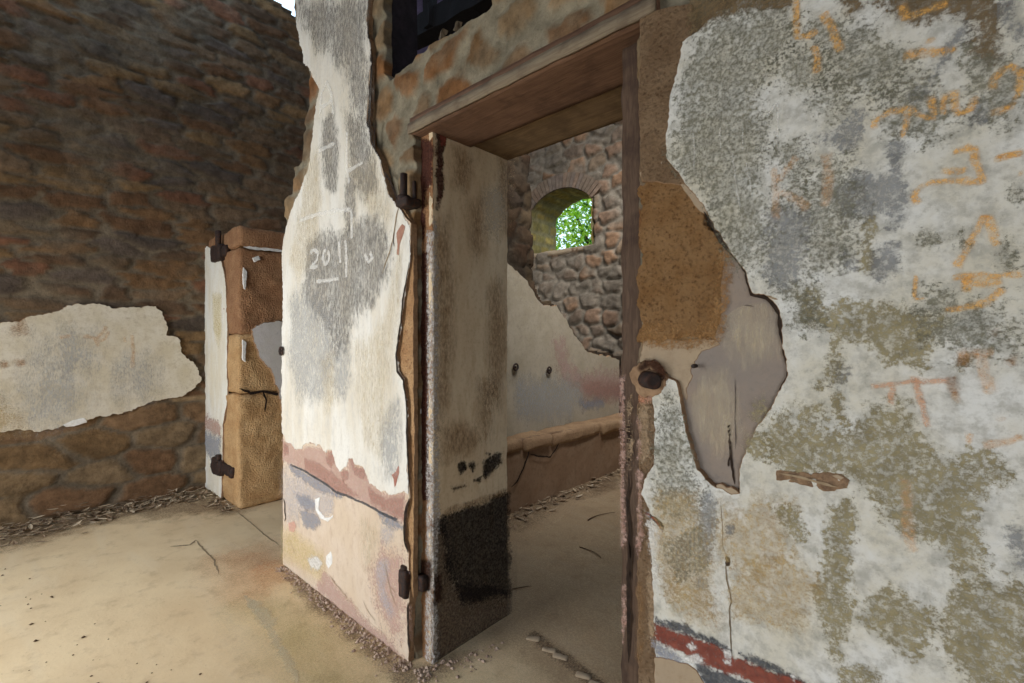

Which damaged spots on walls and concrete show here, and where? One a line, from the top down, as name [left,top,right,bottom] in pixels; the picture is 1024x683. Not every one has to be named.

spalling [242,256,260,289]
spalling [636,172,787,494]
spalling [242,320,283,409]
crack [239,388,278,411]
peeling [63,418,87,427]
peeling [205,415,221,460]
crack [512,445,558,486]
spalling [776,470,850,491]
crack [720,385,736,653]